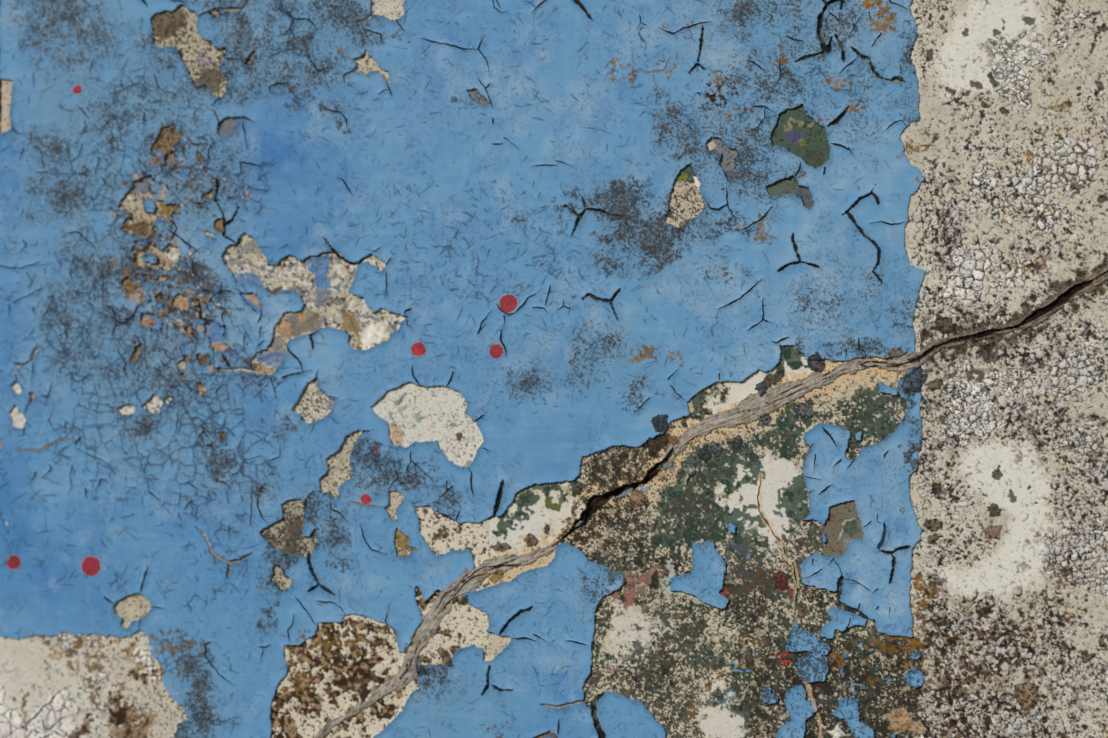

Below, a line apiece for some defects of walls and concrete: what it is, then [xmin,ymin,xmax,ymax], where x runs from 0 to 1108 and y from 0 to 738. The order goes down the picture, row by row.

peeling [150,5,228,98]
crack [638,15,712,94]
crack [747,0,920,82]
peeling [771,105,831,169]
peeling [222,234,408,375]
crack [717,233,820,343]
crack [842,185,903,285]
peeling [261,499,318,591]
peeling [271,346,925,738]
crack [304,267,1108,738]
crack [258,551,345,659]
peeling [0,594,189,738]